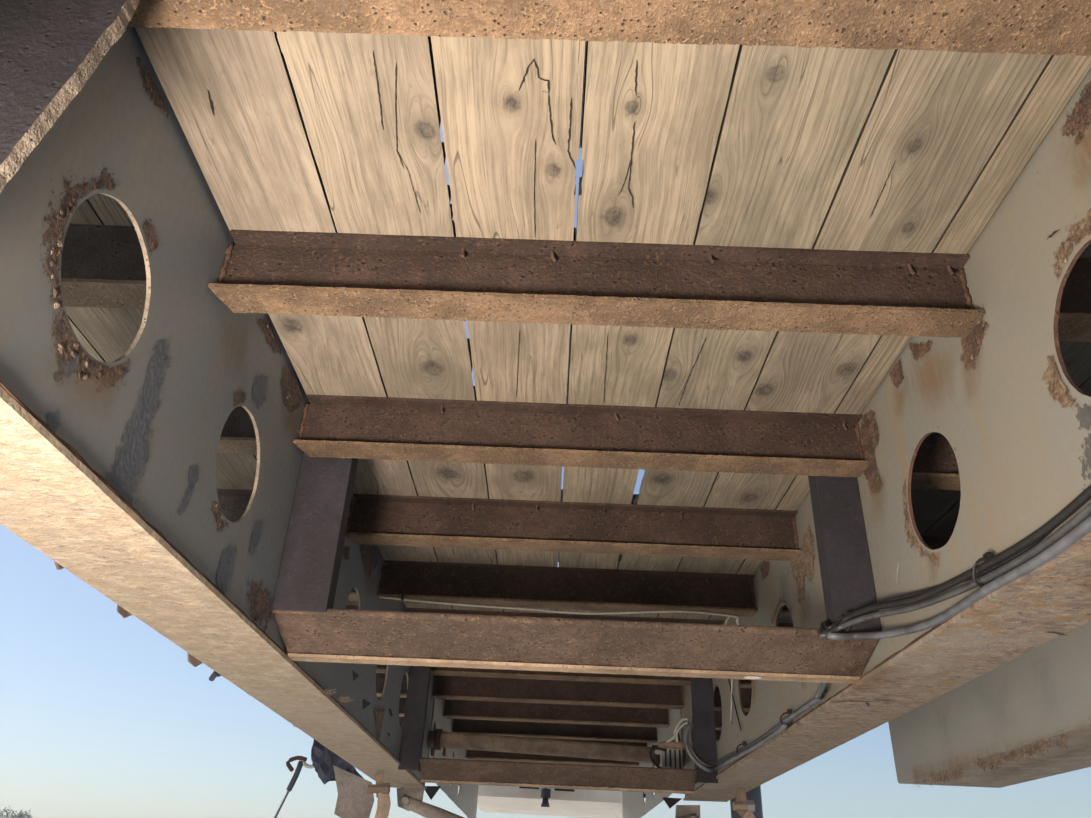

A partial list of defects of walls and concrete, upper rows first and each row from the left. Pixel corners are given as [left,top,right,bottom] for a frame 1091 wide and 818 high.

corrosion [135,57,169,117]
crack [518,59,576,233]
crack [618,123,635,207]
corrosion [1062,82,1091,145]
peeling [142,219,158,255]
peeling [1052,208,1091,279]
peeling [40,167,130,394]
peeling [106,339,171,506]
peeling [1042,356,1091,490]
corrosion [246,576,273,633]
corrosion [915,730,1068,786]